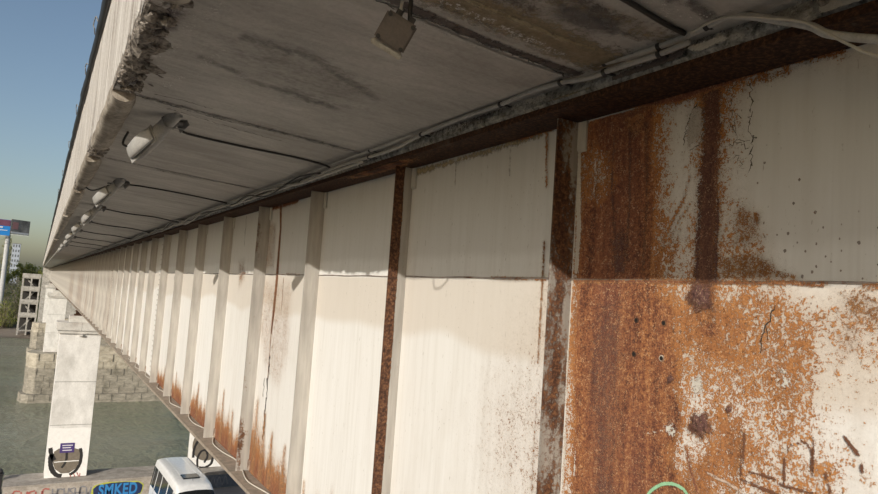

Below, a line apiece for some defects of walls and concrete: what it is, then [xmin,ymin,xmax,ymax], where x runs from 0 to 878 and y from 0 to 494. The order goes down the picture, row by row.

spalling [112,0,194,93]
water stain [420,0,762,80]
crack [683,103,706,150]
crack [726,80,757,173]
rust [562,49,878,494]
rust [157,370,238,459]
rust [249,401,287,494]